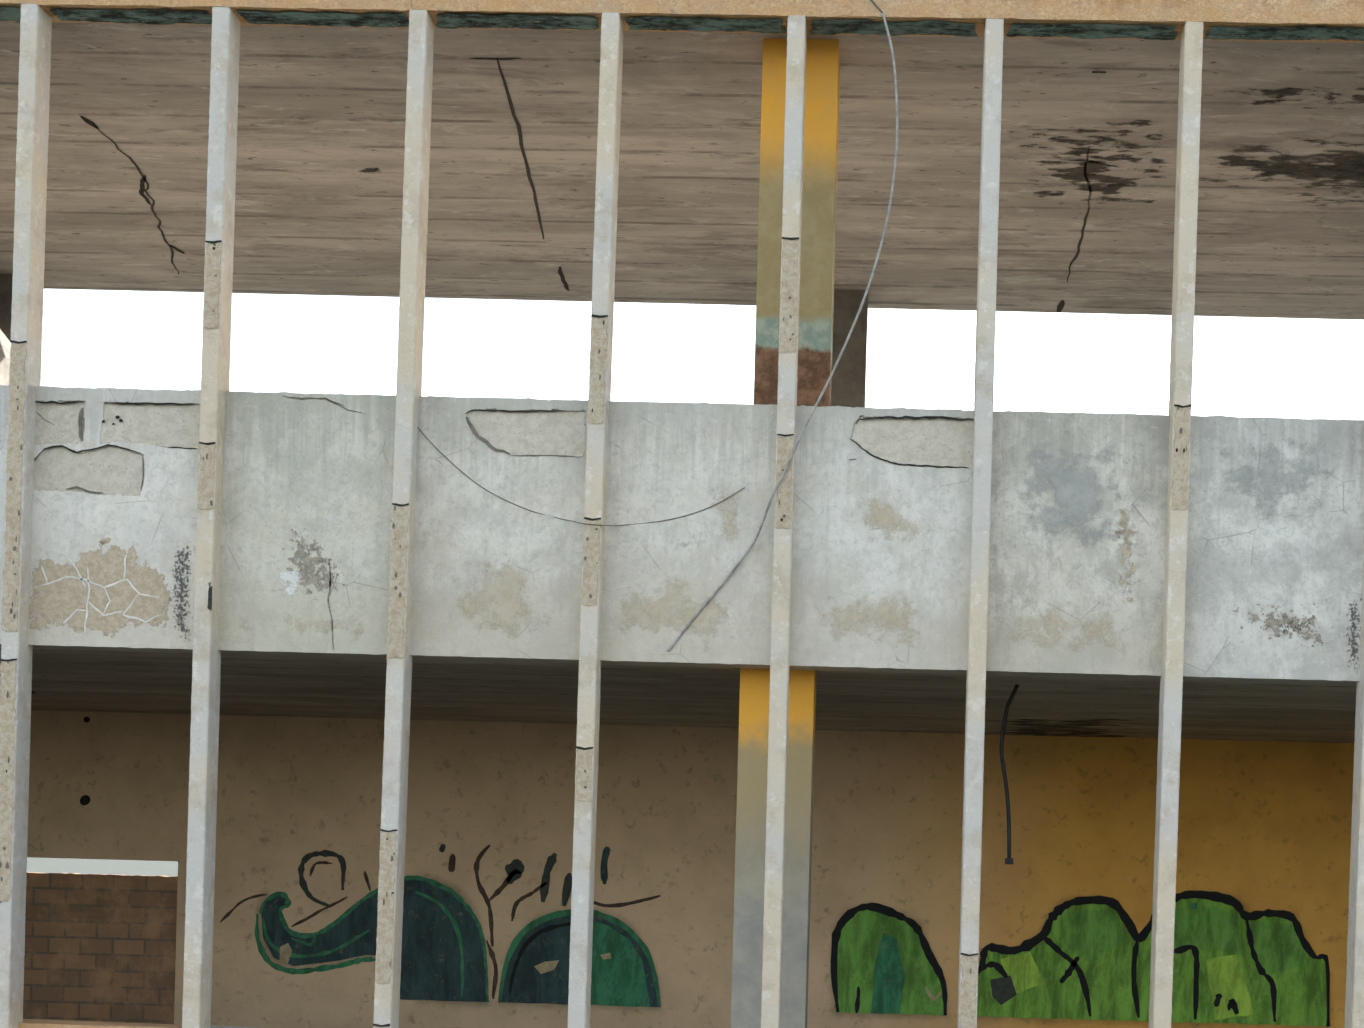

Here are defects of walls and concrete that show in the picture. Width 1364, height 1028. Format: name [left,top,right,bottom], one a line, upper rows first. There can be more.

water stain [1224,87,1364,109]
crack [80,116,185,275]
crack [469,58,544,239]
crack [1057,146,1119,312]
water stain [1024,120,1164,204]
water stain [1201,139,1364,206]
crack [558,267,569,291]
spalling [465,314,608,457]
spalling [849,416,974,468]
peeling [1,340,216,638]
peeling [1227,595,1327,647]
water stain [989,719,1143,737]